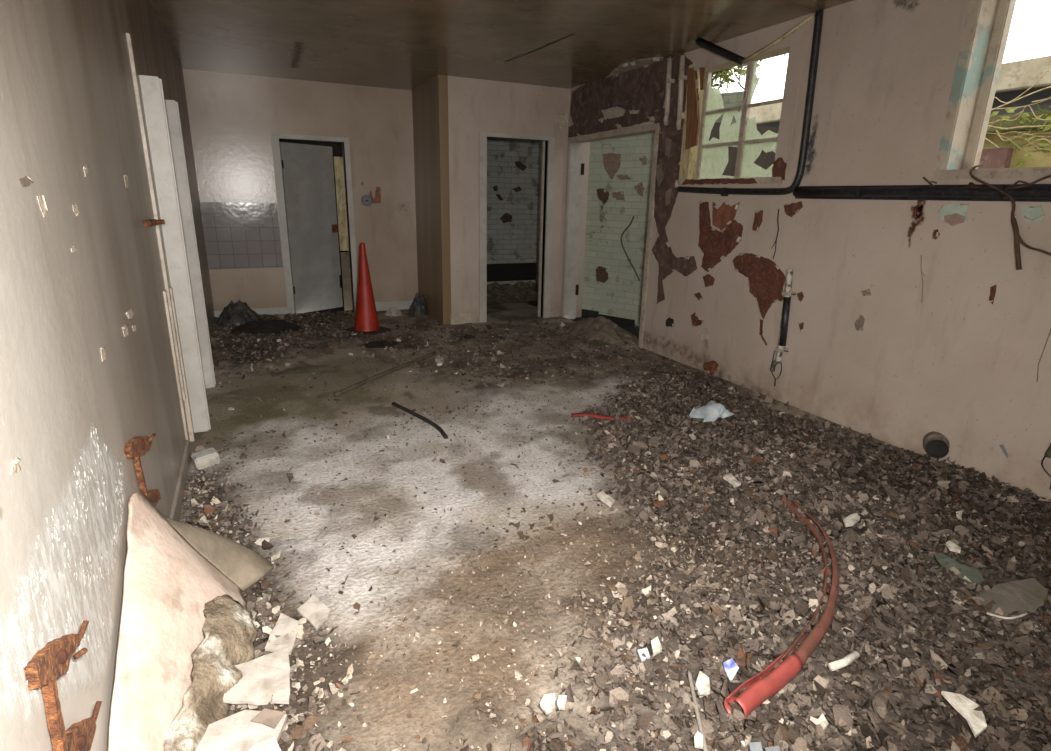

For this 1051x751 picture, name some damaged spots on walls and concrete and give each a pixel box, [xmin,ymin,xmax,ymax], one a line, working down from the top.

peeling [18,176,34,187]
peeling [37,195,48,217]
flaking render [568,54,786,345]
flaking render [784,201,803,217]
peeling [122,309,137,337]